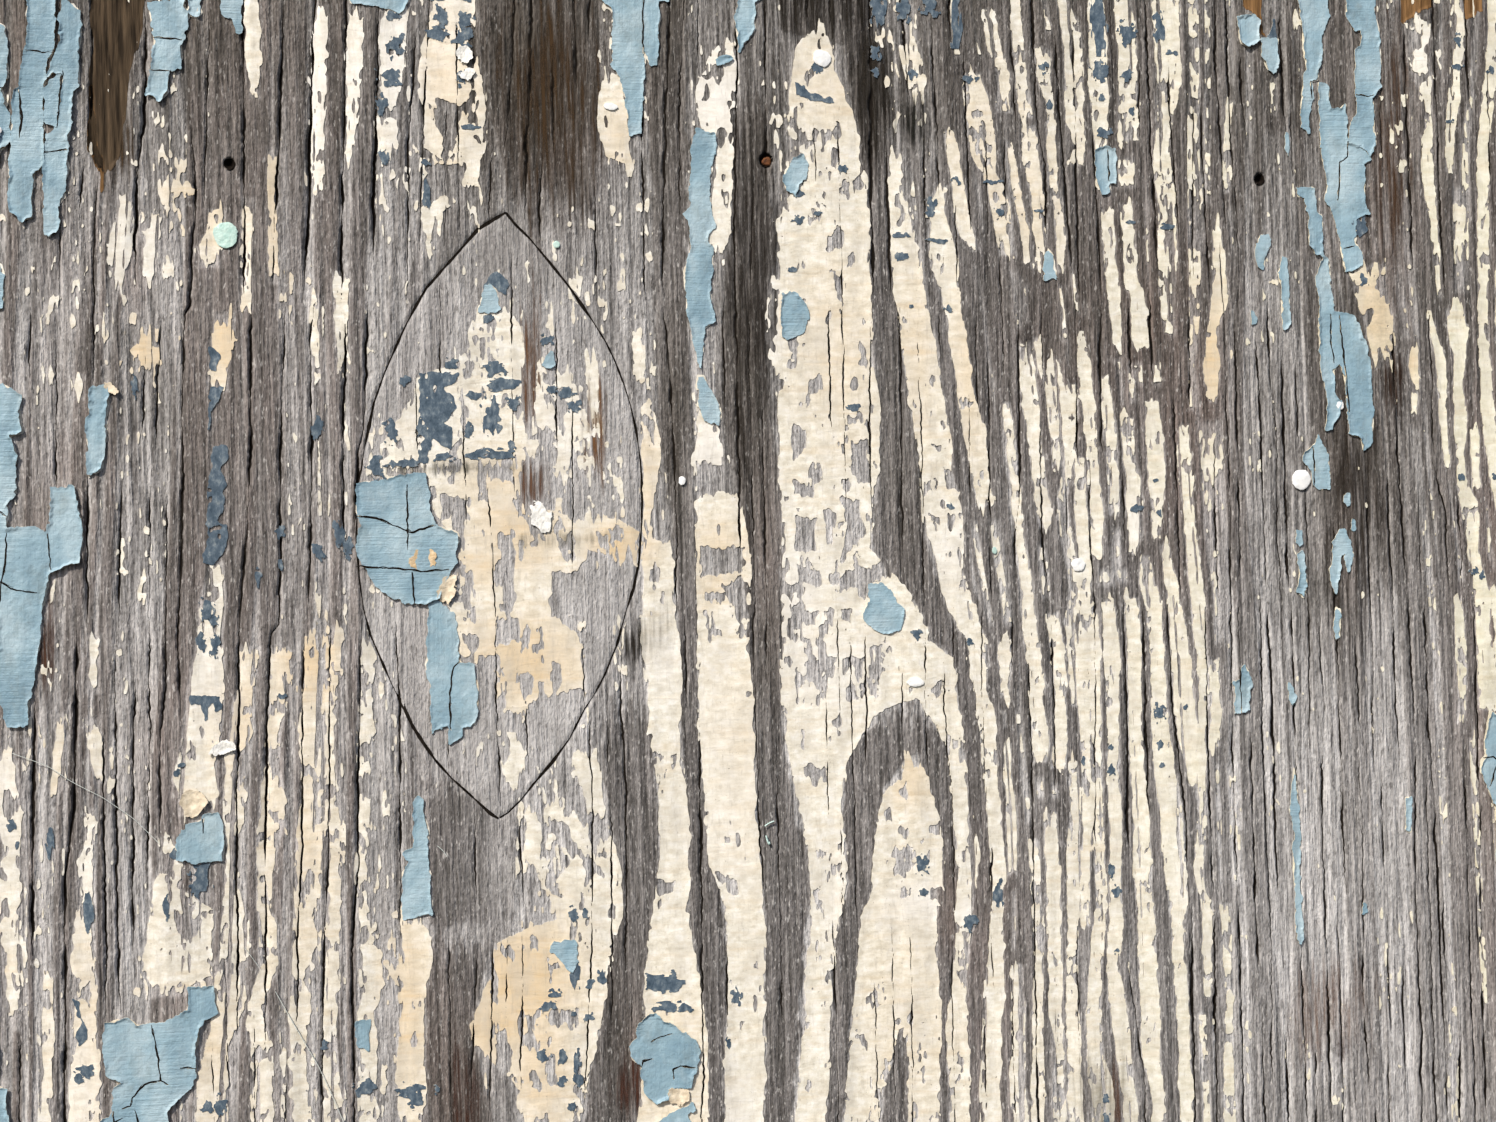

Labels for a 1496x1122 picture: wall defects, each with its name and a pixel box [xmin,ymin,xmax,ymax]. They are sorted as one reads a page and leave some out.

peeling [0,0,83,237]
peeling [0,365,110,728]
peeling [145,0,263,102]
peeling [38,155,440,1122]
peeling [308,0,486,260]
crack [28,0,783,1122]
peeling [311,271,767,1122]
peeling [683,0,758,476]
peeling [1236,0,1496,811]
peeling [0,746,24,1016]
peeling [0,1086,9,1122]
crack [16,1026,24,1122]